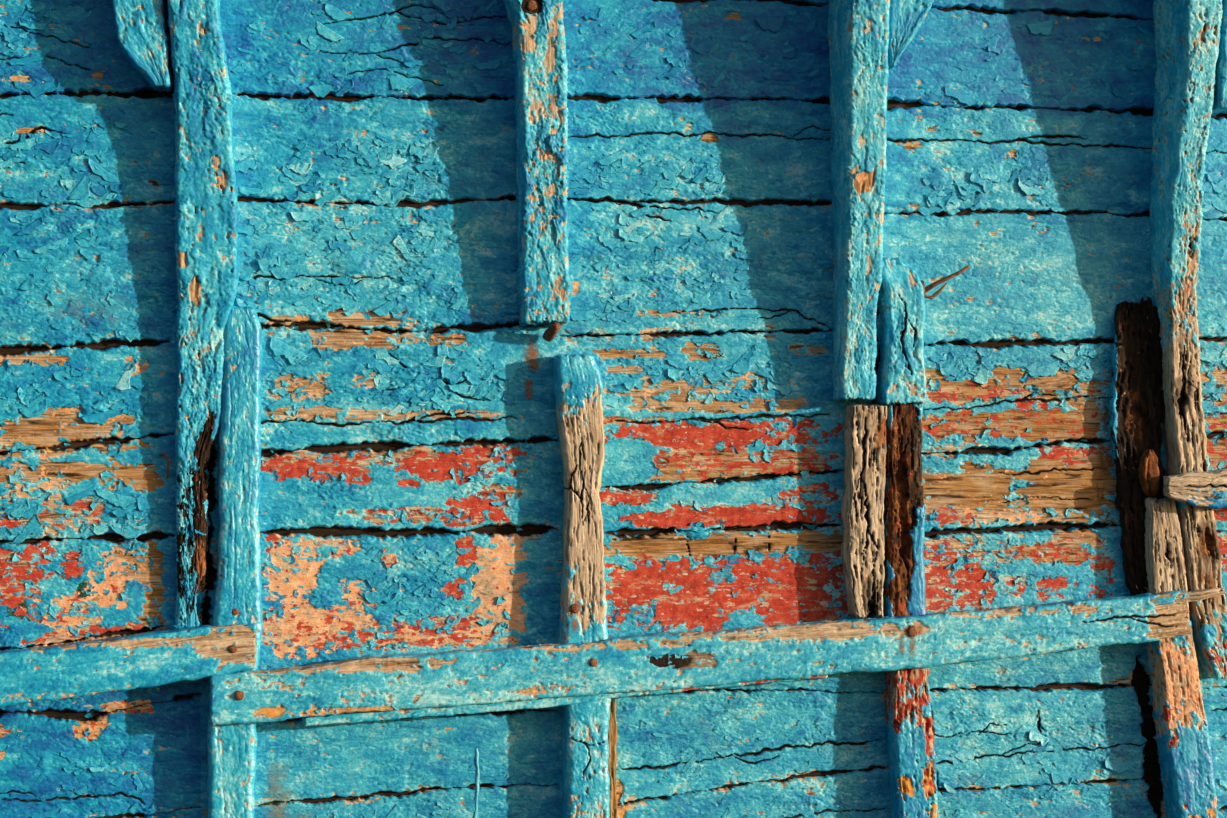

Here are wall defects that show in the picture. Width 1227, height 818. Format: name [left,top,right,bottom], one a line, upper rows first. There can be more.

crack [324,5,510,86]
peeling [0,118,133,208]
peeling [176,252,202,309]
peeling [0,288,209,647]
peeling [591,342,851,632]
crack [853,294,917,580]
peeling [921,343,1119,613]
peeling [260,442,532,660]
crack [624,740,874,770]
crack [784,808,885,818]
peeling [895,715,983,818]
crack [931,710,1147,793]